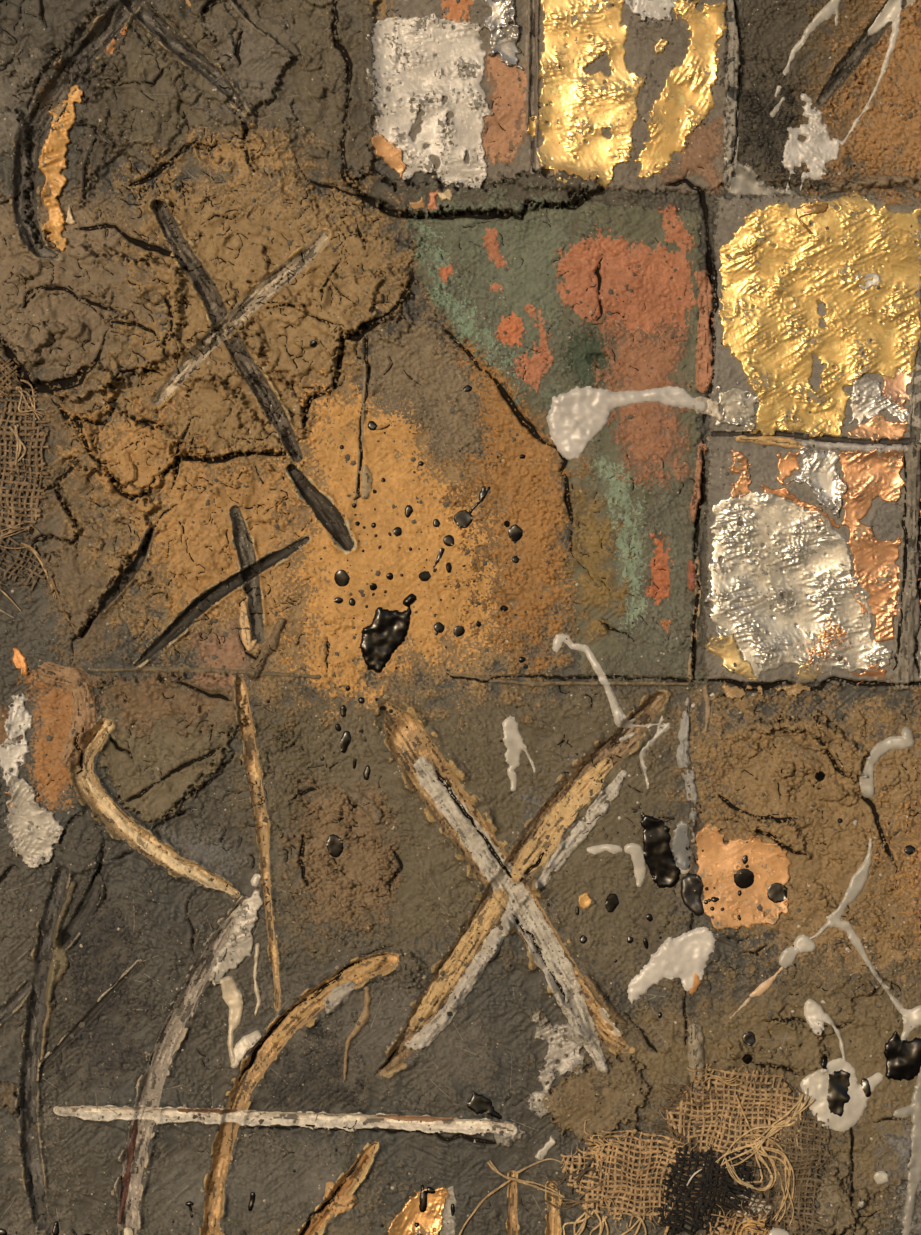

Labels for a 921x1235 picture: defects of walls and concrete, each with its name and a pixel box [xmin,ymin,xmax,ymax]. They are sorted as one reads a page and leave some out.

crack [683,906,901,1045]
crack [14,1022,62,1118]